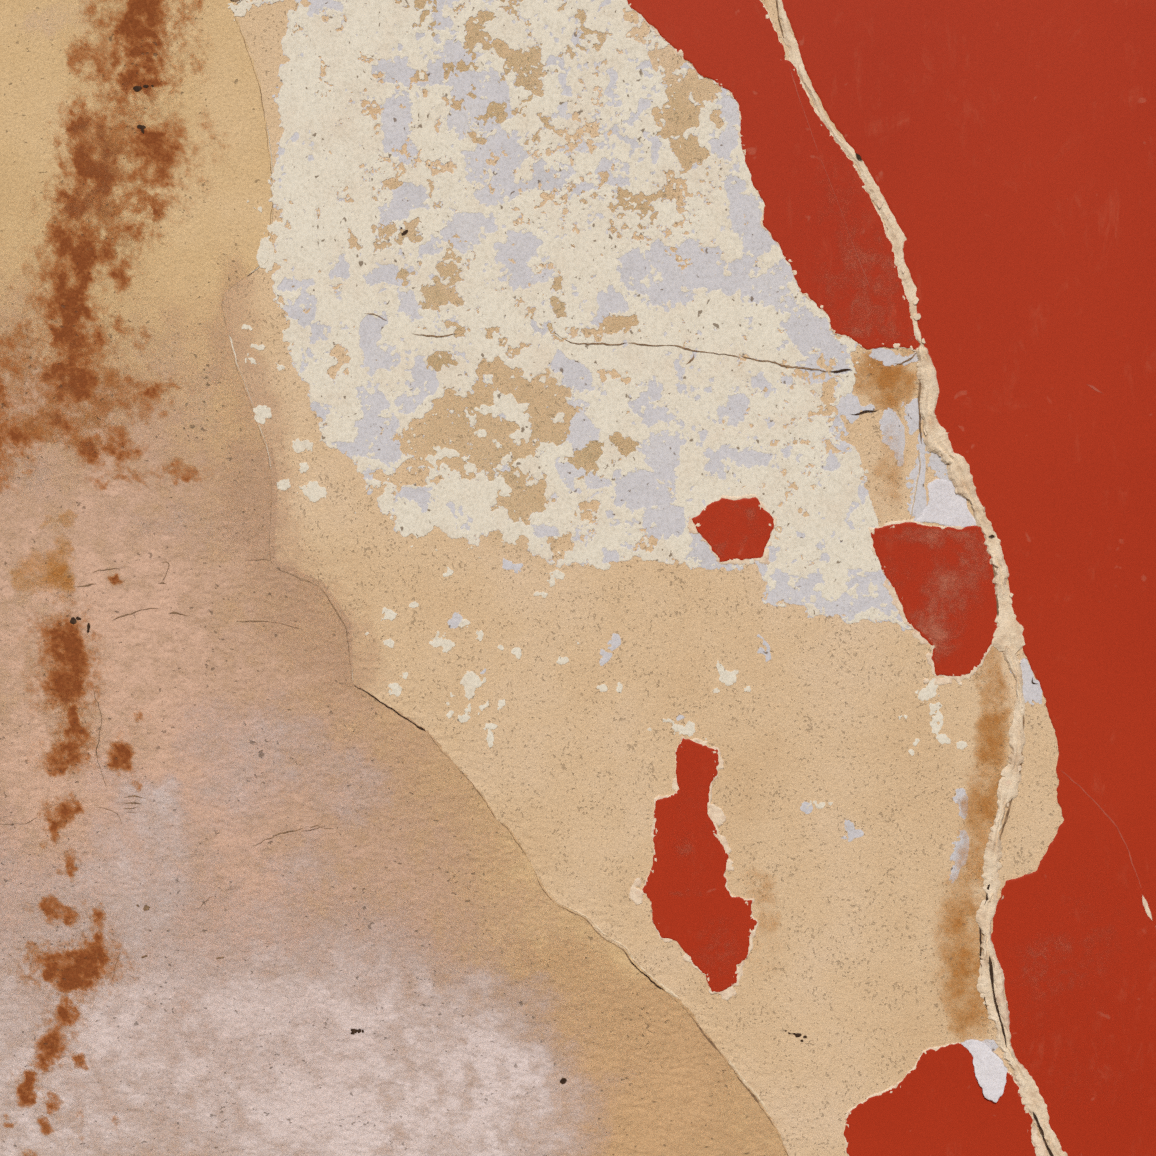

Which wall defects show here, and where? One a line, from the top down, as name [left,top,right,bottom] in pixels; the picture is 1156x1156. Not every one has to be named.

rust [0,0,202,491]
spalling [0,0,274,527]
crack [554,332,853,373]
rust [42,794,84,848]
rust [39,616,96,777]
crack [92,688,142,821]
rust [107,742,134,771]
crack [114,561,188,620]
crack [222,0,788,1156]
peeling [222,0,1017,1156]
peeling [997,647,1064,900]
rust [16,895,121,1135]